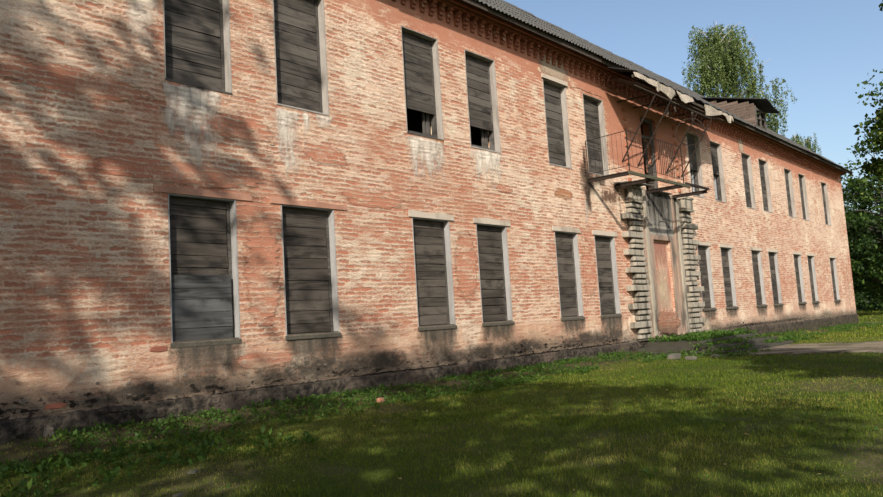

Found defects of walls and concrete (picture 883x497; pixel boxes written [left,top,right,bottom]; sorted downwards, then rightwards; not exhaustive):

damp [164,83,219,158]
damp [277,108,331,165]
damp [408,136,443,173]
damp [475,150,501,171]
damp [96,343,240,403]
damp [288,337,397,373]
damp [420,328,461,361]
damp [474,324,532,355]
damp [564,317,622,345]